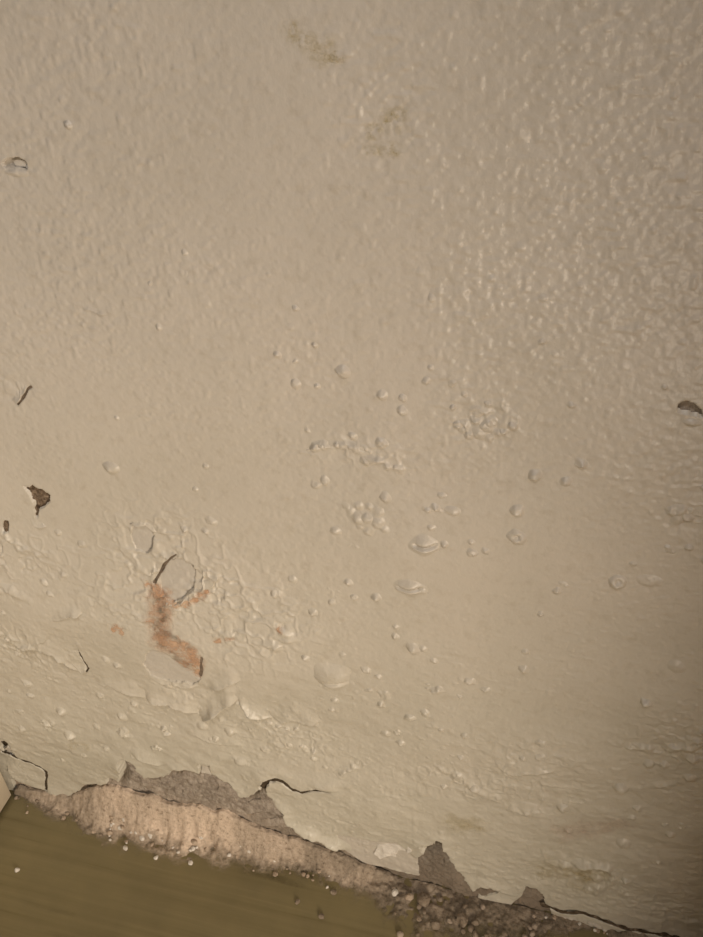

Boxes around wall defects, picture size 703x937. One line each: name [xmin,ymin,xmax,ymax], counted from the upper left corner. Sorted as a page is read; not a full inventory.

crack [12,385,32,405]
peeling [678,401,702,426]
peeling [27,485,50,529]
crack [153,554,177,583]
peeling [130,521,218,612]
peeling [143,650,201,689]
peeling [81,742,326,848]
crack [260,778,324,794]
peeling [338,835,603,929]
crack [540,902,680,937]